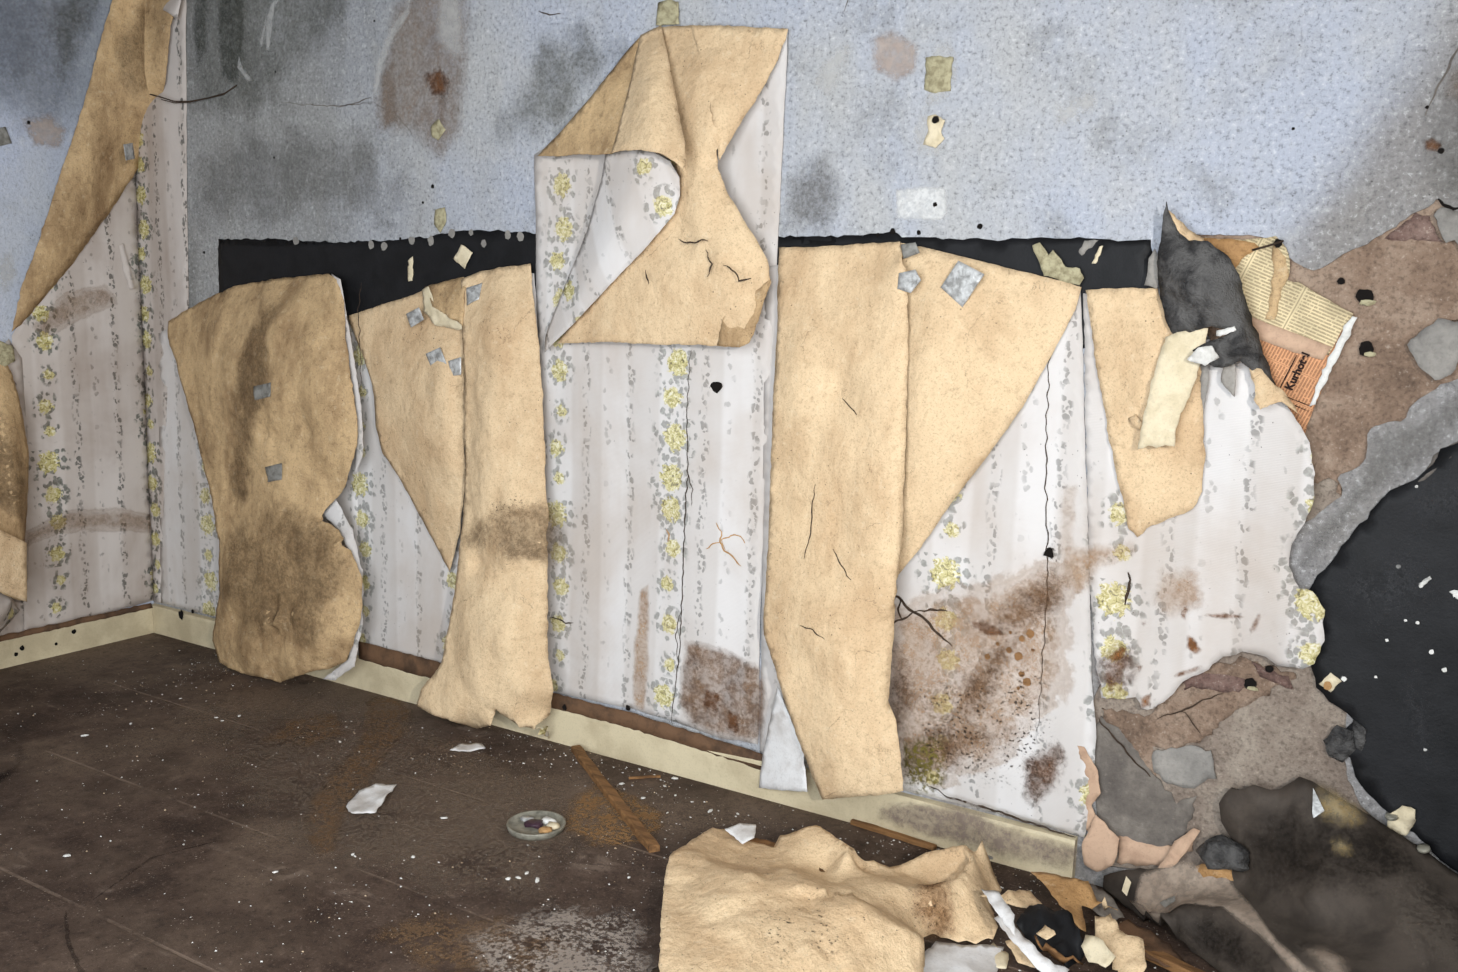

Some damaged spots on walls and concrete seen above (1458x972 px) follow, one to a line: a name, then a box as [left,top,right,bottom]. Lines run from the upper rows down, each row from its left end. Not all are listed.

spalling [1206,326,1225,341]
spalling [1288,200,1458,522]
leakage [681,645,763,738]
leakage [890,548,1107,793]
spalling [1093,651,1370,870]